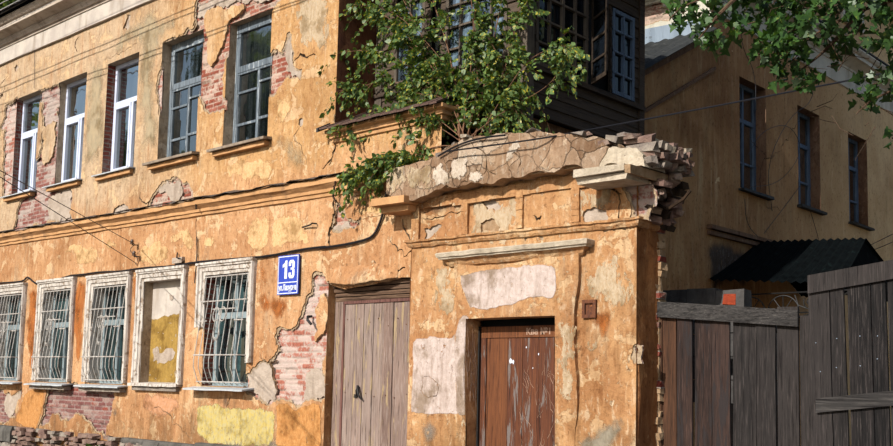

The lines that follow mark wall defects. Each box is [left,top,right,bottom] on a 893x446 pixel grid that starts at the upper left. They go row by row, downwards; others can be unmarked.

spalling [163,0,281,114]
peeling [270,0,329,122]
spalling [0,94,18,197]
spalling [13,84,74,231]
spalling [148,176,194,208]
peeling [227,158,272,180]
crack [360,211,460,272]
peeling [424,224,442,239]
crack [443,142,521,189]
peeling [471,197,516,245]
spalling [243,271,335,408]
spalling [0,382,159,446]